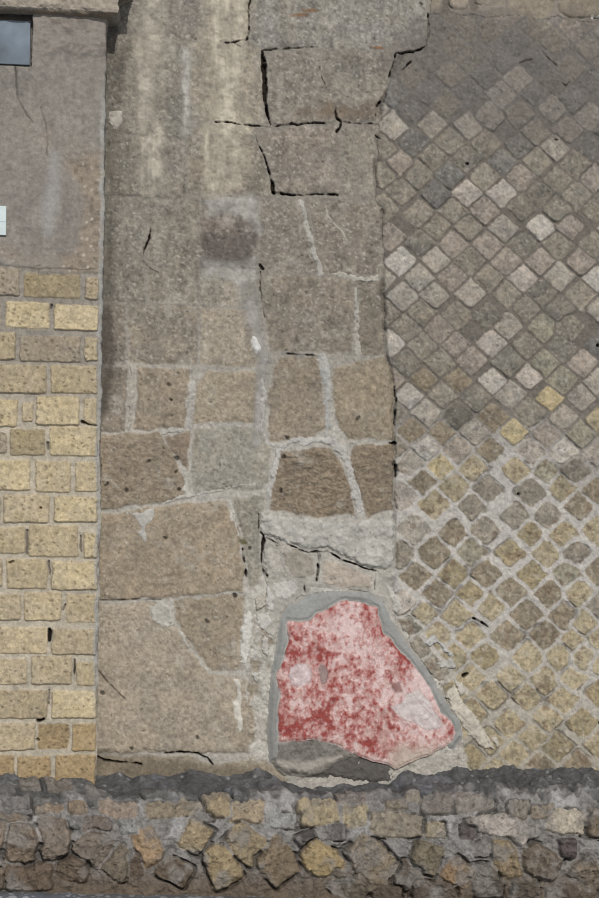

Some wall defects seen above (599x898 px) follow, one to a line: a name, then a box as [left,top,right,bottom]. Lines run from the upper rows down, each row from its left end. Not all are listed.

crack [215,0,381,359]
crack [161,353,375,591]
crack [389,386,397,477]
crack [97,755,142,765]
crack [165,751,213,765]